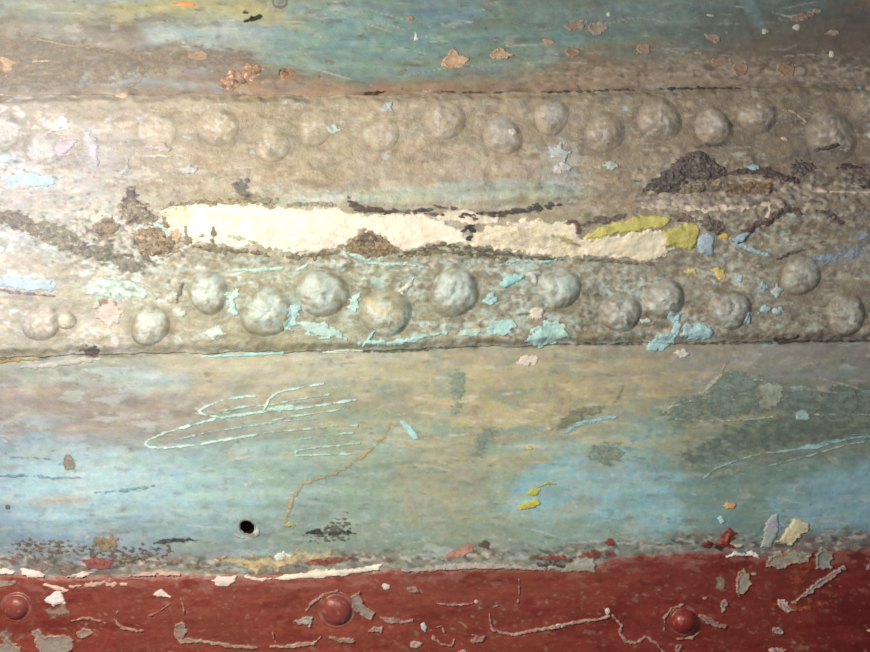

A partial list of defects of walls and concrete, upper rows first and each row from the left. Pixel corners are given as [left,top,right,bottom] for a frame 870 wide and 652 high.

peeling [790,9,822,31]
peeling [637,142,851,256]
peeling [812,163,870,194]
spalling [92,197,562,305]
peeling [812,233,870,264]
peeling [211,549,382,587]
peeling [401,557,596,573]
peeling [700,513,861,613]
peeling [0,557,181,652]
peeling [293,589,339,628]
peeling [350,591,486,652]
peeling [675,576,728,652]